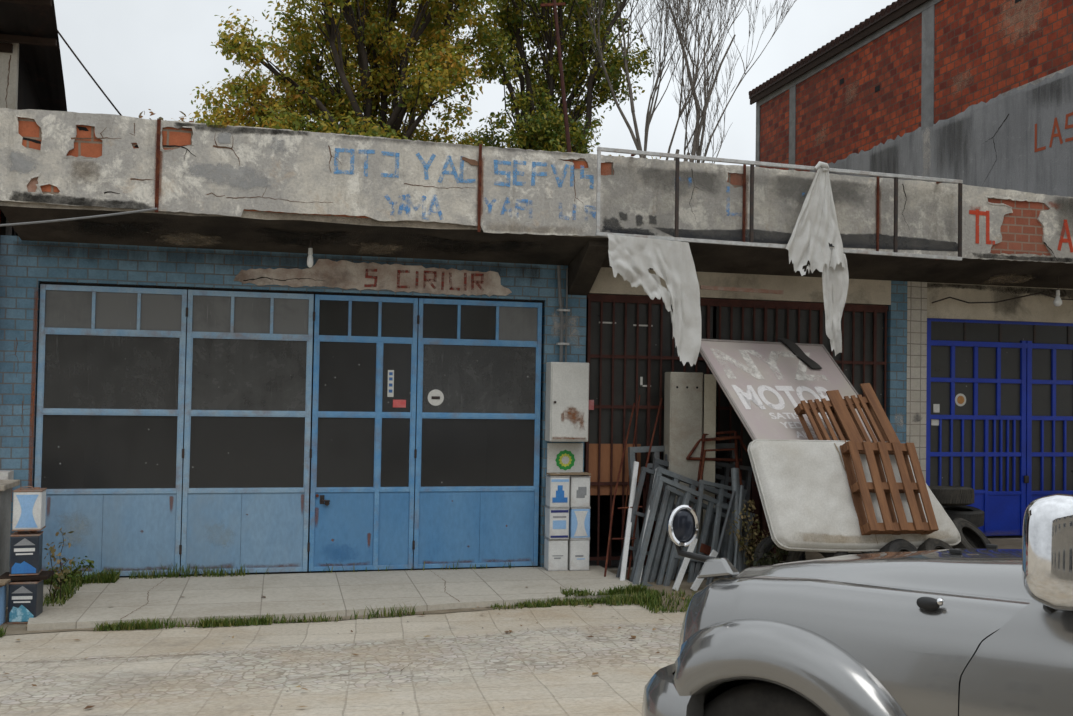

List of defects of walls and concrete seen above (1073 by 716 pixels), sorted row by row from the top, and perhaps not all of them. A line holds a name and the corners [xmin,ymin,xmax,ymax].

flaking render [14,114,45,155]
flaking render [62,120,102,162]
flaking render [160,126,198,152]
crack [181,133,240,165]
flaking render [27,172,63,196]
crack [206,190,333,203]
leakage [778,176,813,202]
leakage [830,181,861,203]
flaking render [984,195,1054,258]